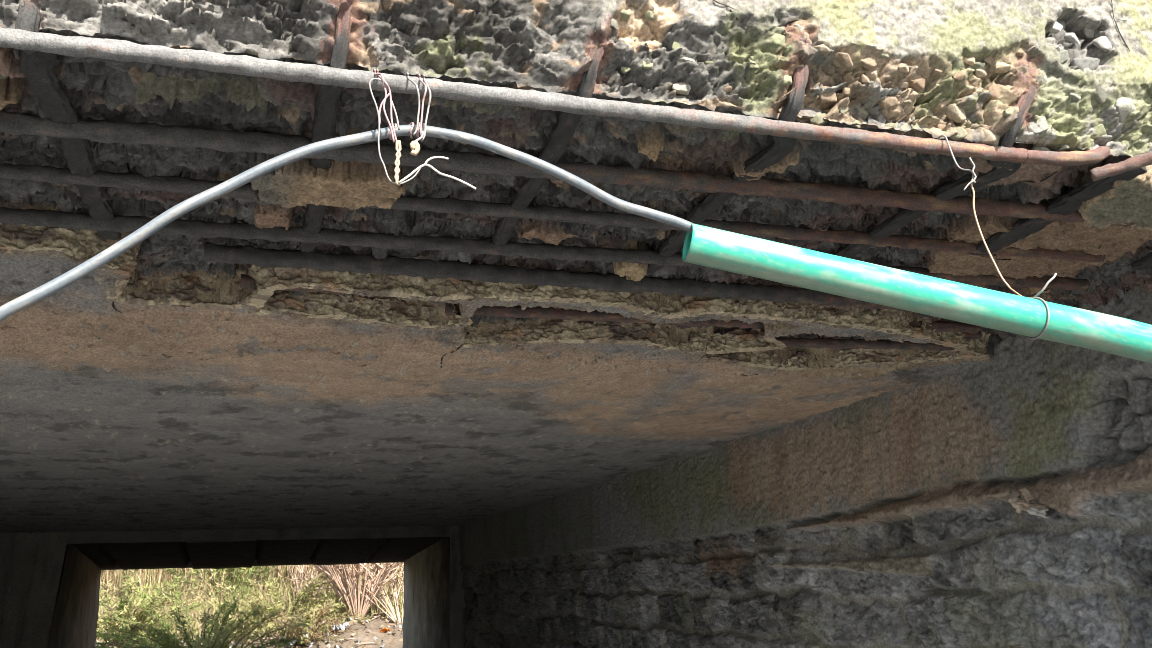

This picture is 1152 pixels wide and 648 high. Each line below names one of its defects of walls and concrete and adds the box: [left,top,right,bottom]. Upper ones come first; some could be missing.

rust [318,0,366,67]
spalling [0,0,1152,380]